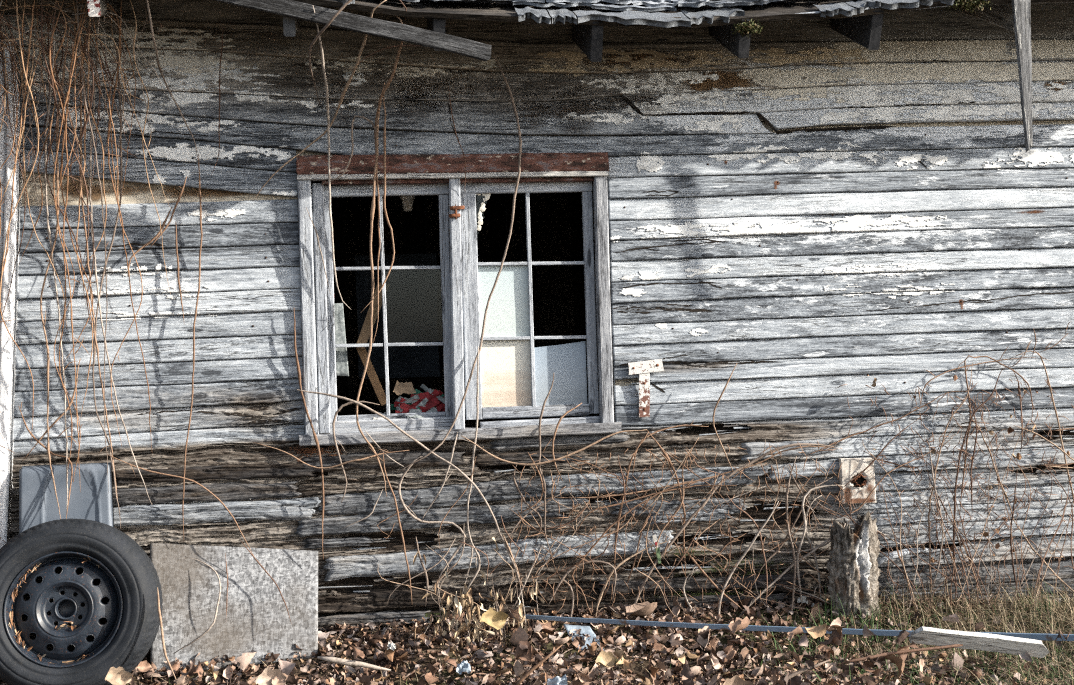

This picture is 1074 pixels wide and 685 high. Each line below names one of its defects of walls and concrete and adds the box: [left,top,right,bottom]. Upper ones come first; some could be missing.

peeling [304,56,497,87]
peeling [0,13,374,178]
crack [621,94,975,134]
peeling [636,151,665,172]
peeling [982,147,1074,170]
damp [63,180,149,200]
damp [165,187,245,197]
peeling [637,214,947,239]
corrosion [844,474,874,504]